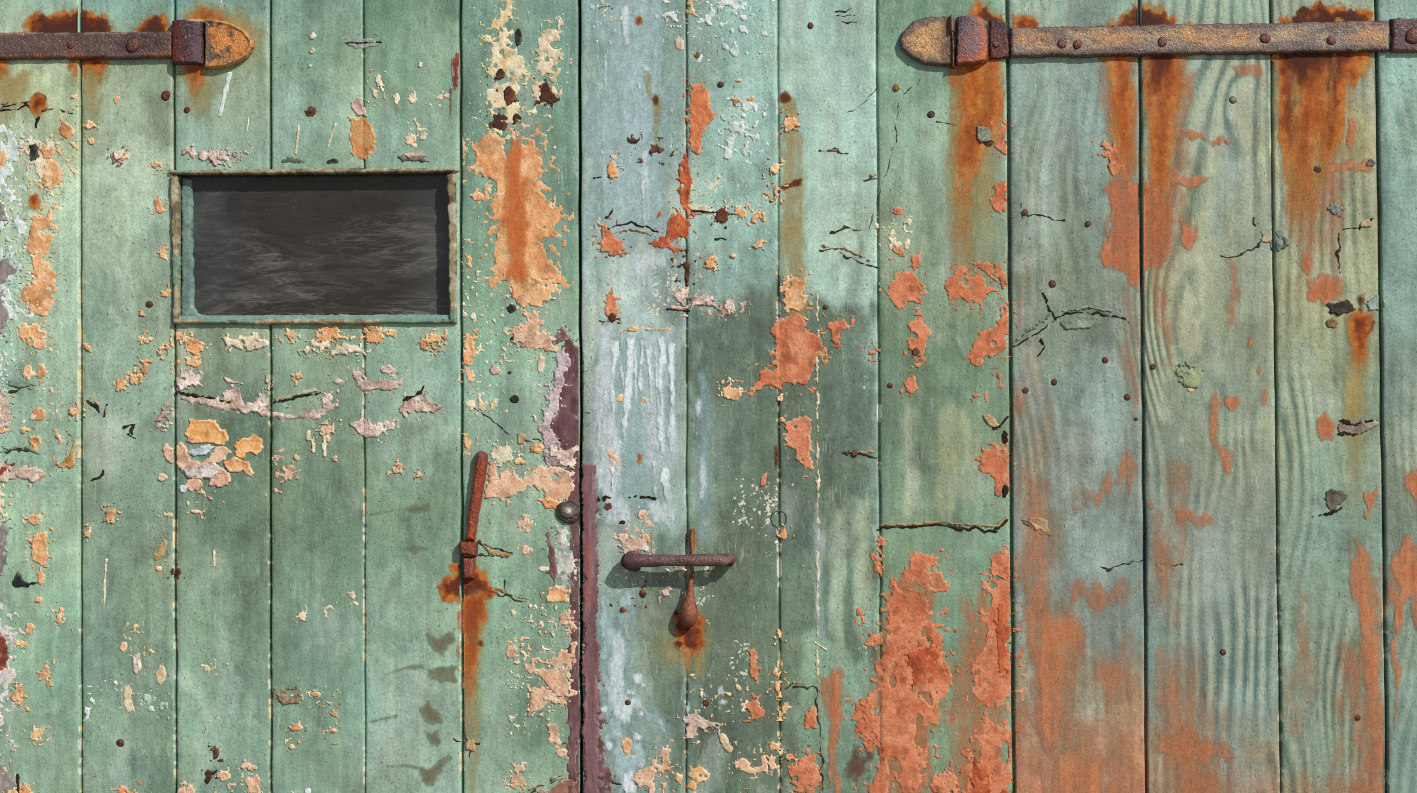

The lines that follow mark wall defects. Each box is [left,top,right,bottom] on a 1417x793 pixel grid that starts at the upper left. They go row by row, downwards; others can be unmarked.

rust [946,53,1005,264]
rust [1100,55,1192,236]
peeling [1093,140,1206,290]
rust [1272,52,1371,243]
peeling [0,94,132,793]
peeling [111,0,1144,793]
crack [1013,292,1129,357]
peeling [1210,393,1240,473]
peeling [83,622,184,721]
rust [438,562,498,790]
rust [666,610,710,677]
peeling [1156,652,1232,793]